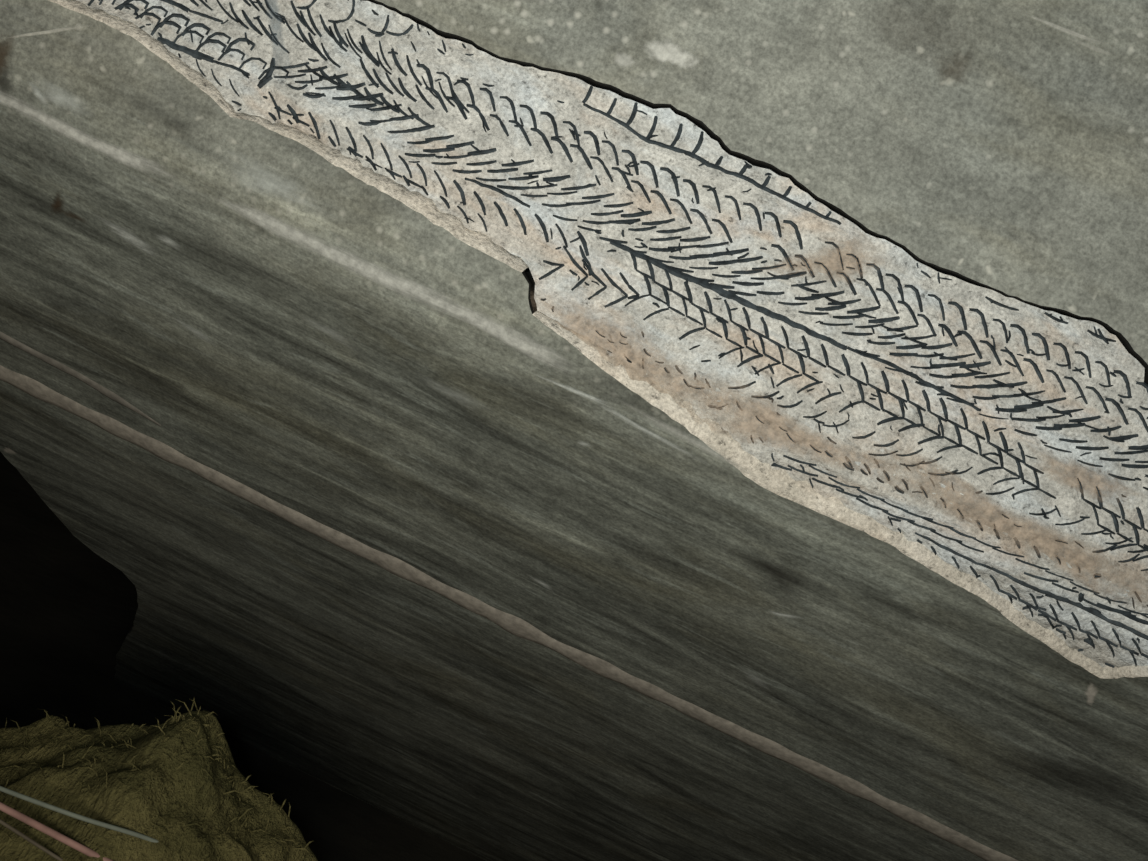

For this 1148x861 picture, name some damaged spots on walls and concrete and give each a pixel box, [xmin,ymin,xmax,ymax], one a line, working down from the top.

flaking render [49,0,1148,679]